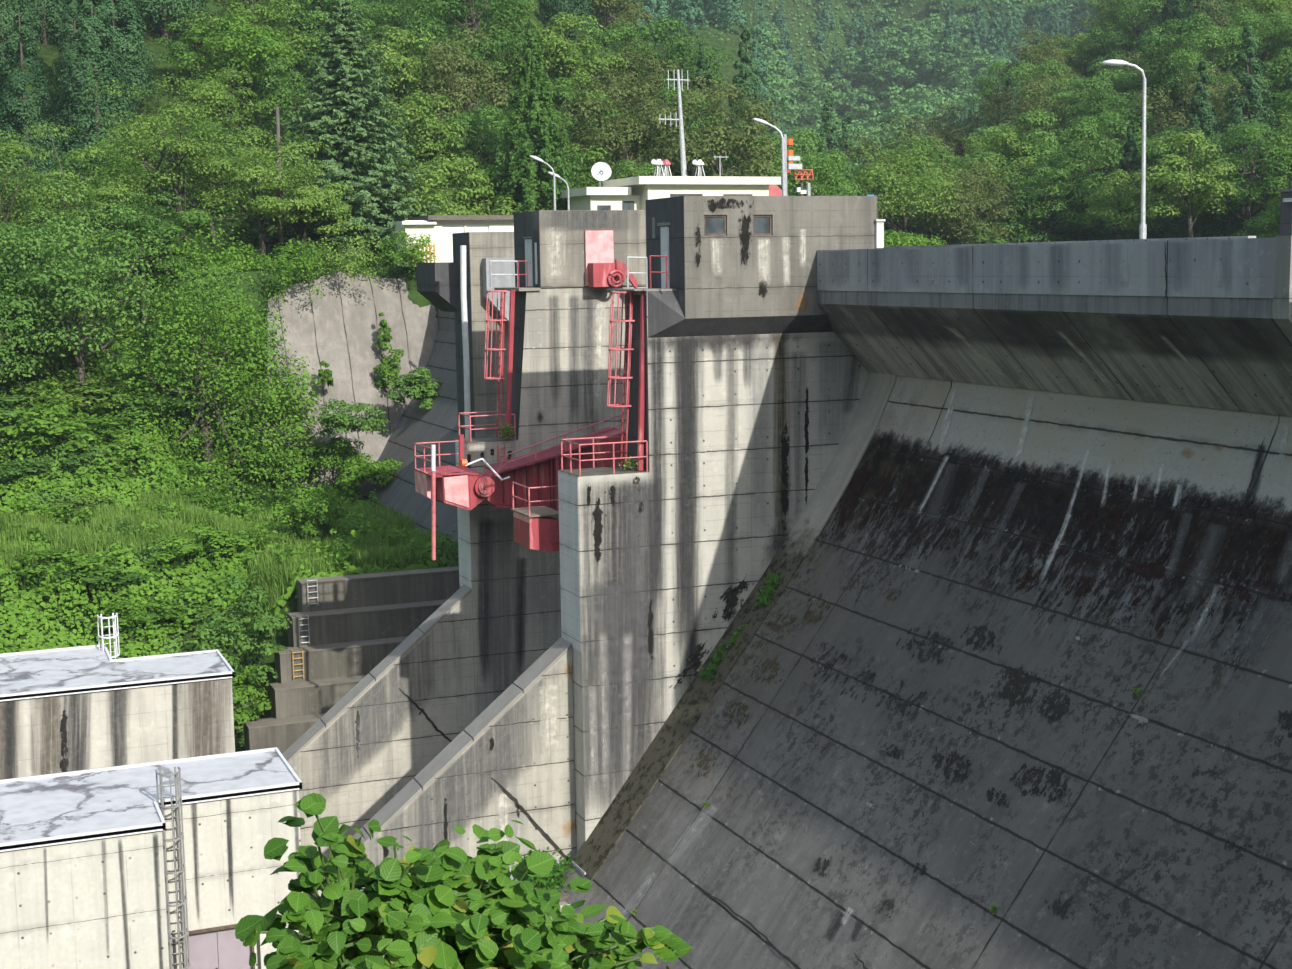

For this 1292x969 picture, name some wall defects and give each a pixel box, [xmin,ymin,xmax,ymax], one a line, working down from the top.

damp [1248,445,1264,498]
damp [584,333,809,795]
damp [0,700,15,780]
damp [40,693,87,775]
damp [111,689,126,766]
damp [173,680,224,759]
crack [399,688,452,742]
crack [491,777,571,862]